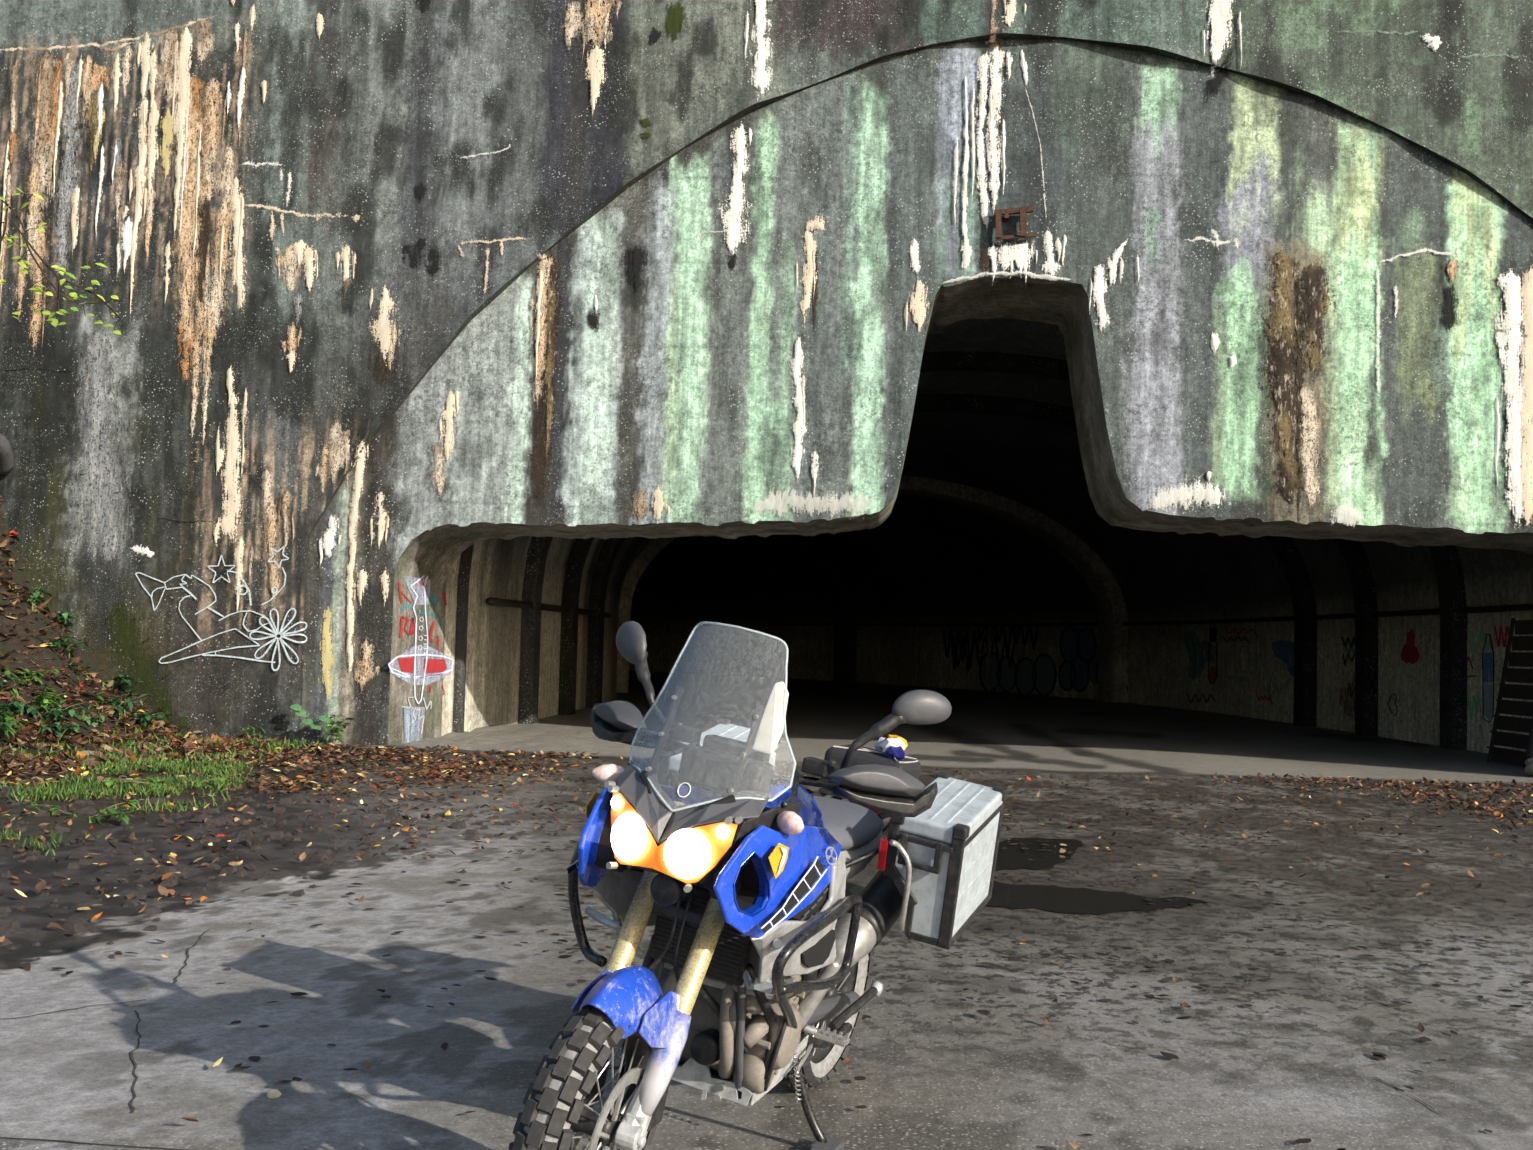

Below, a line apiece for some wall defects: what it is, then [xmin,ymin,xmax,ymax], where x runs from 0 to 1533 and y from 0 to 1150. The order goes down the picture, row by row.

water stain [715,124,753,270]
water stain [748,337,876,520]
corrosion [1253,249,1339,527]
water stain [1493,266,1533,533]